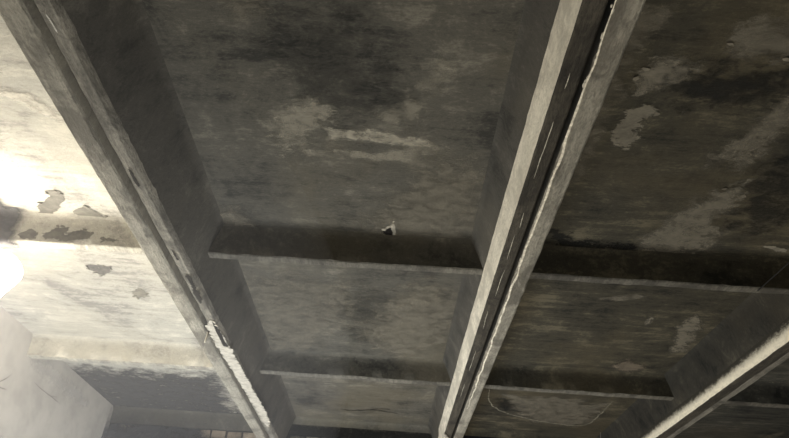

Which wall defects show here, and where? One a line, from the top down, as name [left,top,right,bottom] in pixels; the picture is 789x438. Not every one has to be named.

damp [308,128,440,161]
peeling [37,190,65,214]
peeling [73,205,108,218]
peeling [18,225,119,242]
peeling [85,264,113,276]
peeling [132,288,150,300]